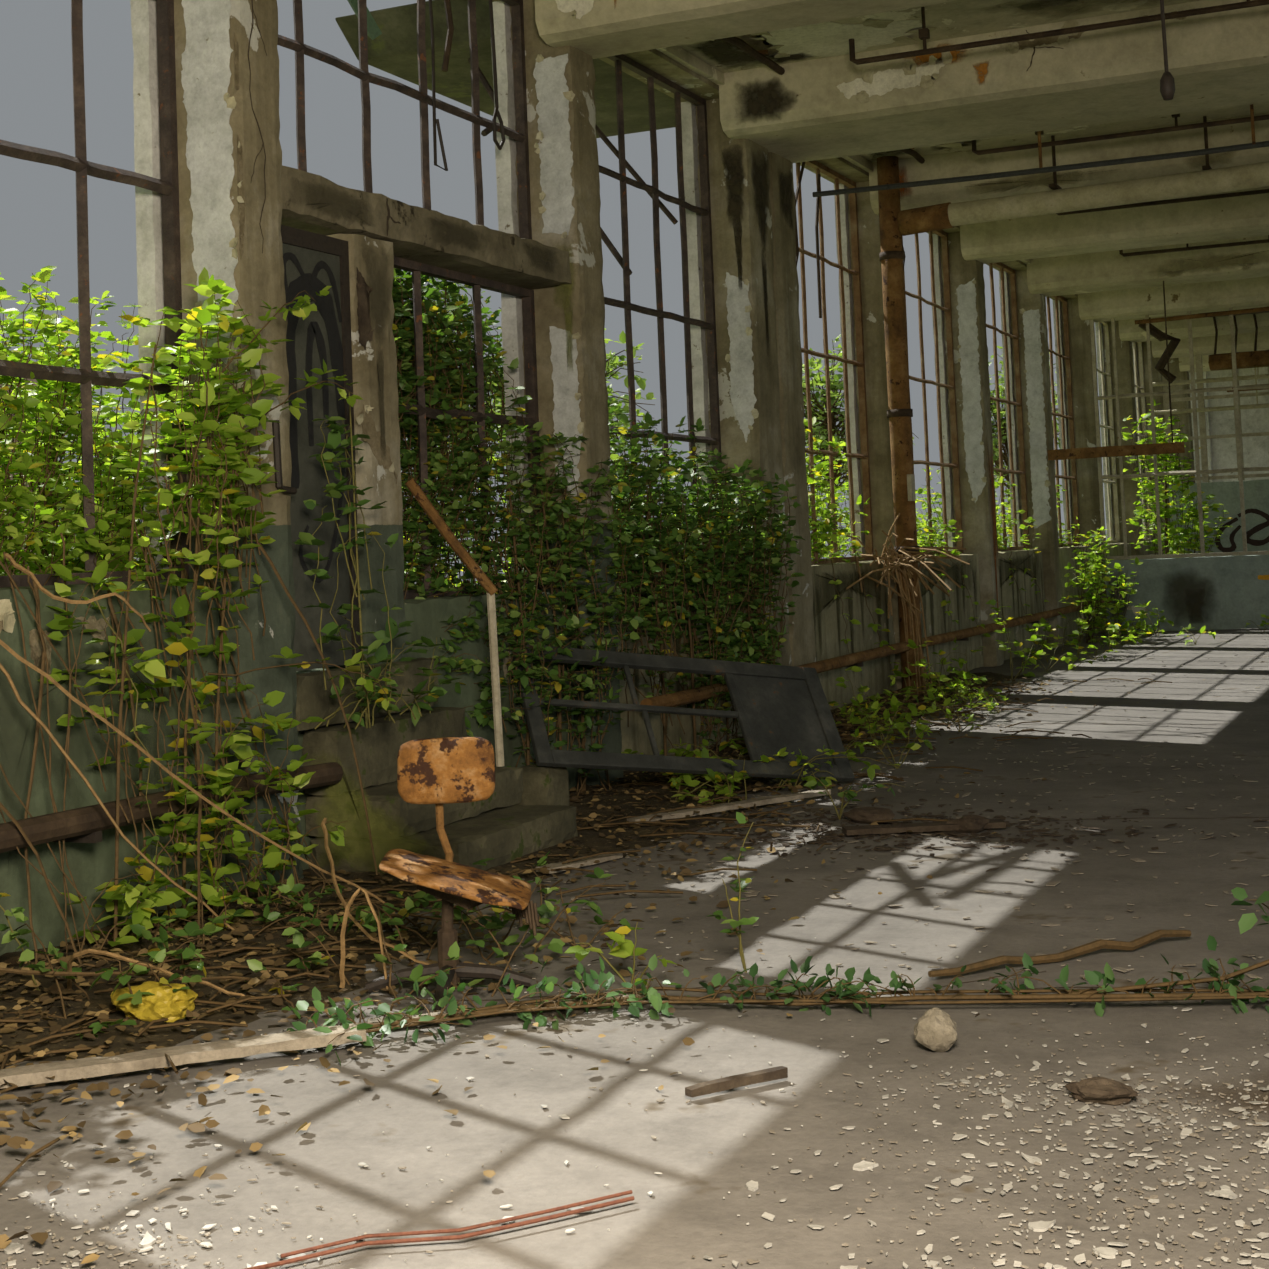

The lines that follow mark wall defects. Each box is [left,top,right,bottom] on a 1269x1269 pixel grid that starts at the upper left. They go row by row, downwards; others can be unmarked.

peeling [555,0,600,19]
mould [692,39,813,68]
peeling [712,19,937,58]
peeling [837,51,953,103]
mould [741,81,794,120]
peeling [533,54,575,239]
damp [723,151,793,286]
peeling [725,272,759,442]
peeling [549,326,584,496]
peeling [0,599,16,633]
peeling [75,616,109,645]